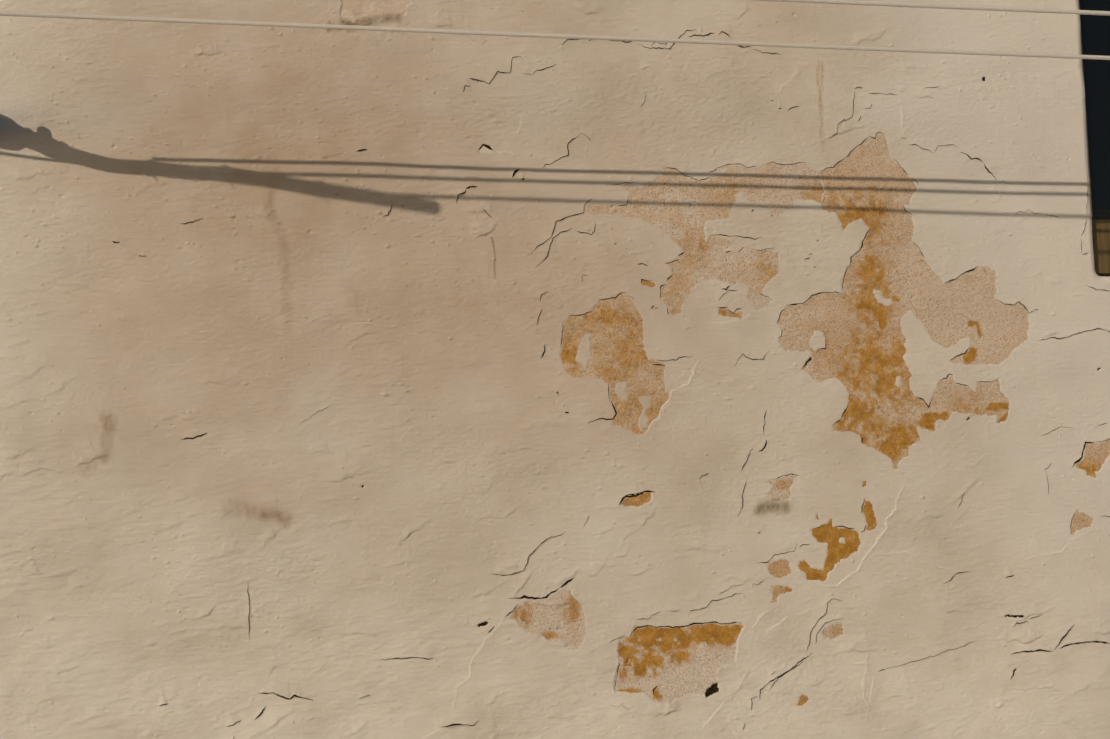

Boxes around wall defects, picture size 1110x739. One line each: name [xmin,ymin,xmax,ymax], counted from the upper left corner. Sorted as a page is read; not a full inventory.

crack [463,30,799,110]
crack [531,198,647,267]
peeling [560,132,1029,470]
crack [1042,328,1110,340]
peeling [1073,439,1110,478]
crack [496,516,589,576]
flaking render [619,490,654,506]
peeling [759,481,877,603]
peeling [1070,511,1110,535]
peeling [504,578,586,650]
flaking render [611,621,744,703]
crack [1011,615,1109,692]